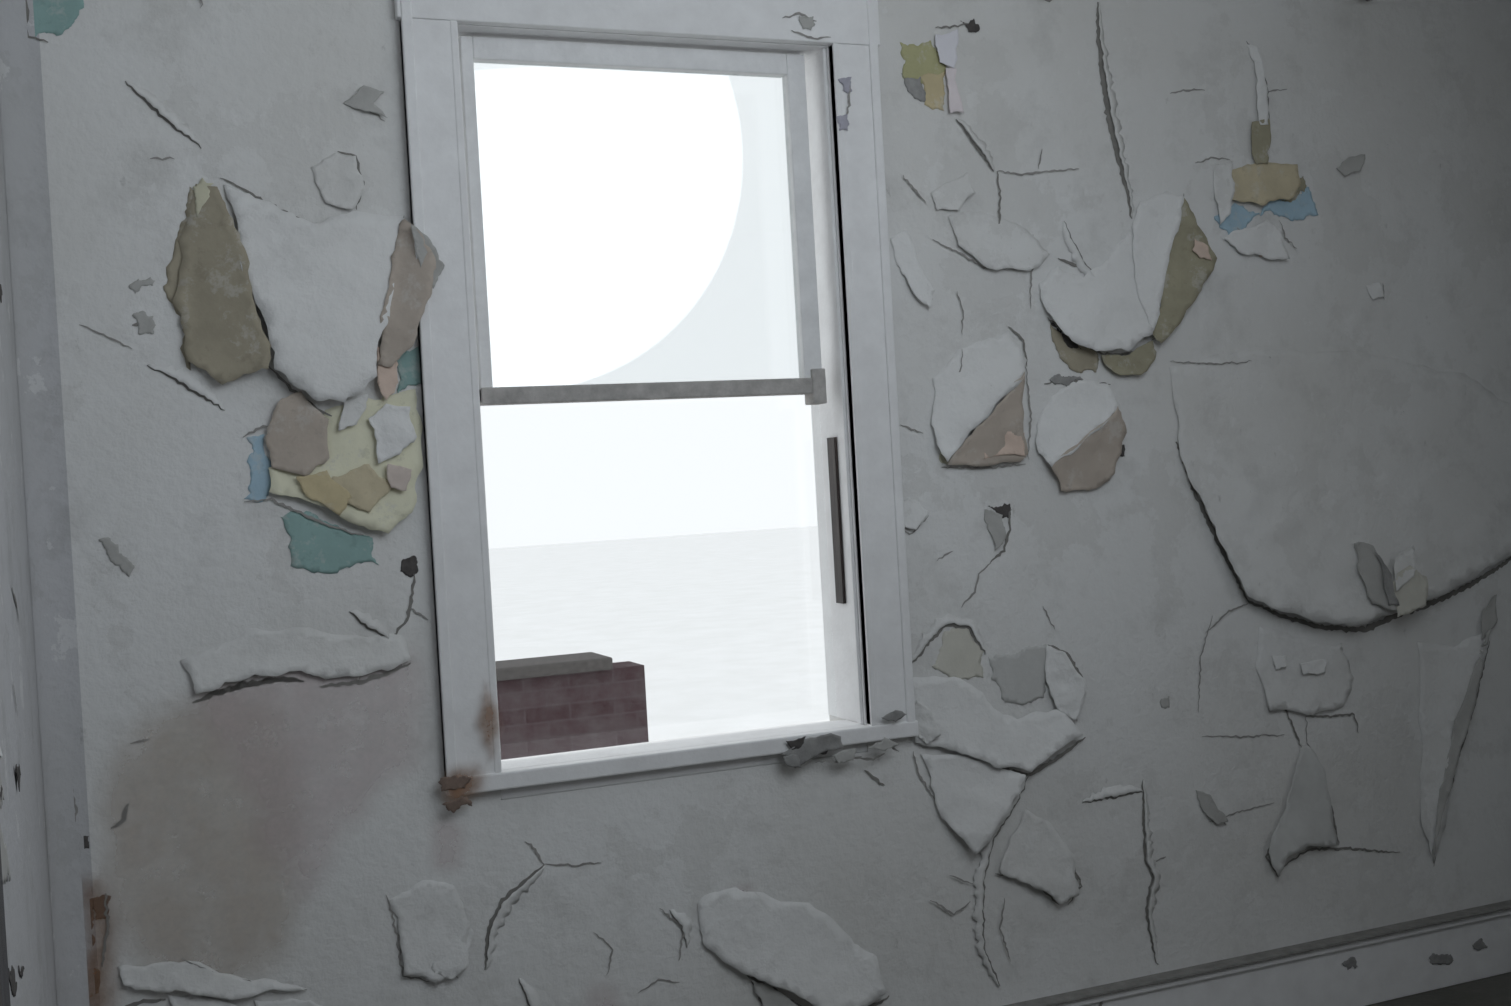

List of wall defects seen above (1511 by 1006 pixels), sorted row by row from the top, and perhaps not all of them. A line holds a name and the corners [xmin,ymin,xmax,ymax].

crack [1096,2,1134,219]
peeling [900,19,1318,492]
peeling [129,178,445,574]
leakage [73,790,89,849]
leakage [111,803,129,829]
corrosion [438,772,477,813]
corrosion [481,703,495,742]
peeling [781,498,1087,987]
leakage [87,893,111,1006]
peeling [118,958,322,1006]
crack [484,842,600,1006]
crack [640,909,692,992]